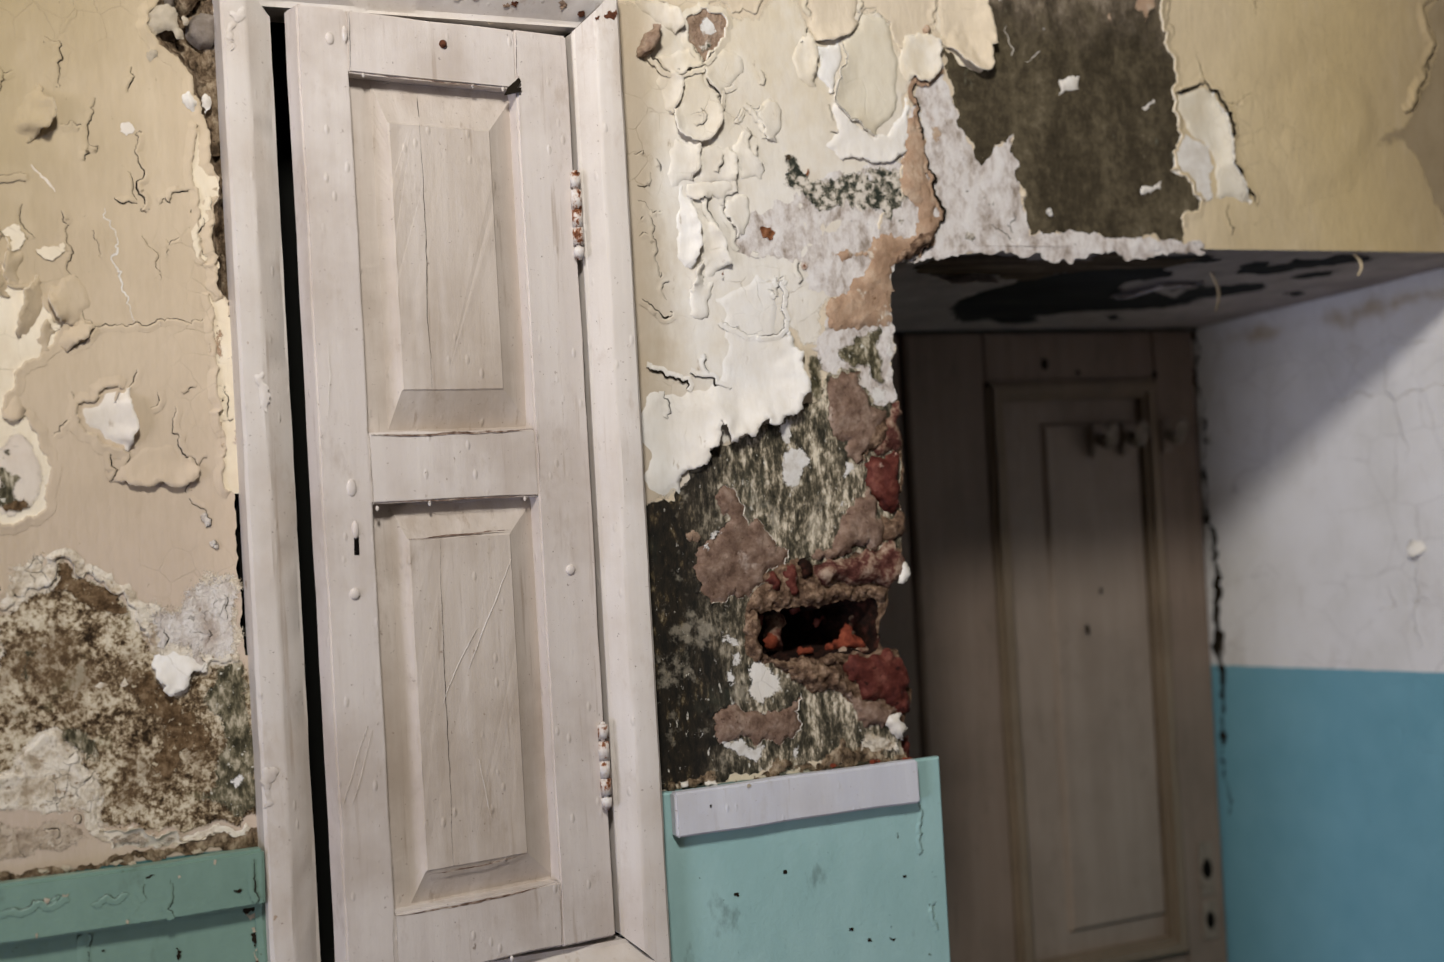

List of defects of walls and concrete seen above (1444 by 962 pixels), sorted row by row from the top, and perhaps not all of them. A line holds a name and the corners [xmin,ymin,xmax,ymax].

crack [0,37,214,356]
spalling [65,0,239,499]
peeling [618,0,999,506]
peeling [909,207,1374,324]
peeling [1140,88,1252,204]
peeling [0,224,94,535]
crack [53,391,81,439]
crack [103,452,131,482]
crack [129,367,233,550]
water stain [0,548,256,848]
crack [157,595,229,666]
spalling [743,557,889,698]